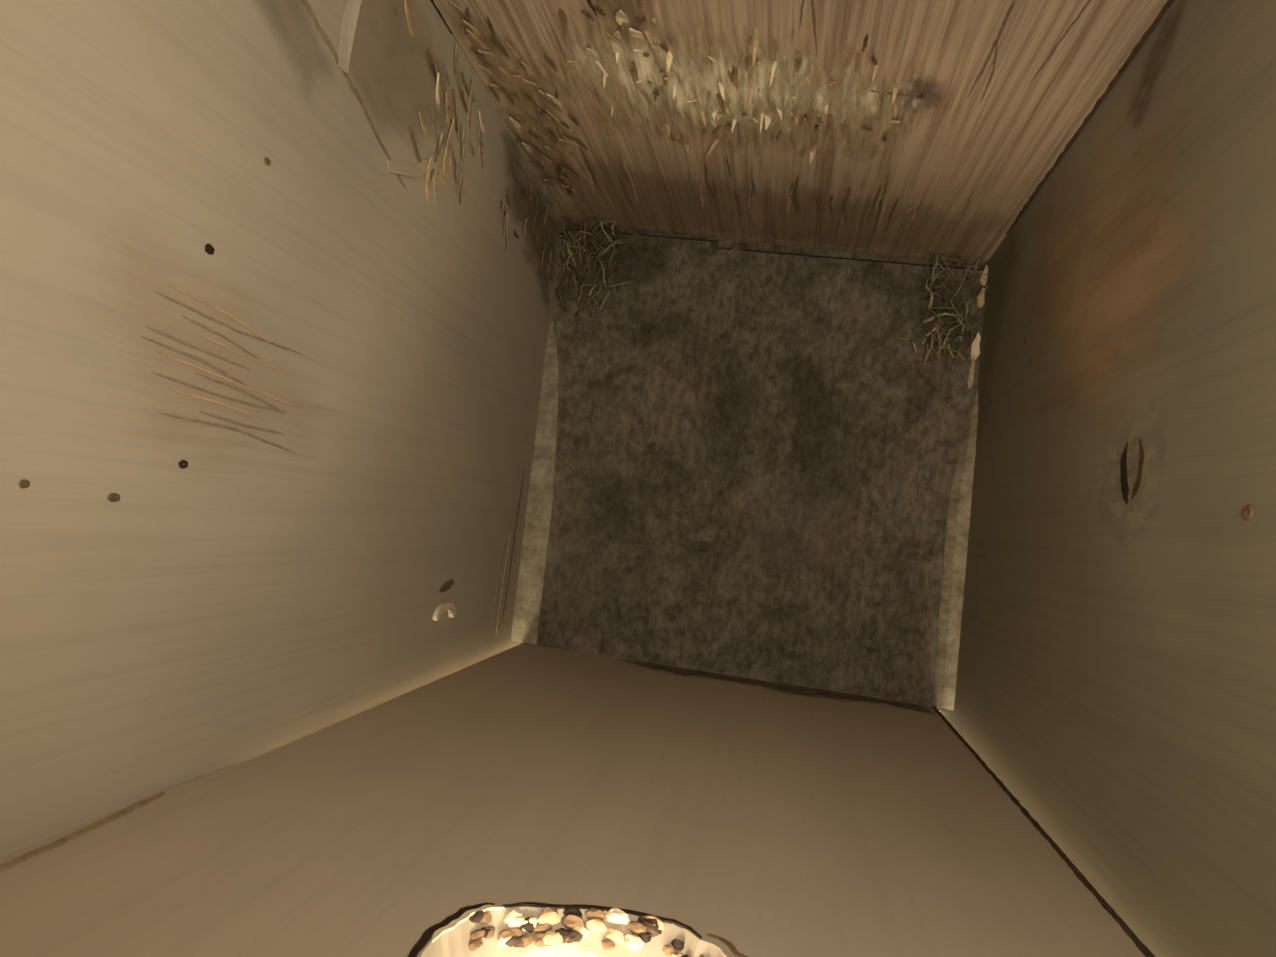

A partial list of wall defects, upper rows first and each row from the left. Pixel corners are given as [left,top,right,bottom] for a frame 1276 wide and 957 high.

crack [300,0,408,191]
spalling [557,0,941,164]
spalling [408,902,748,957]